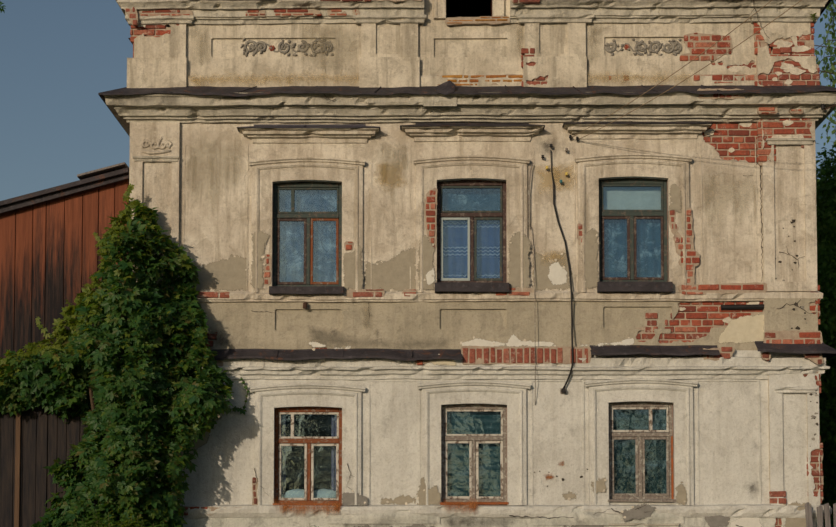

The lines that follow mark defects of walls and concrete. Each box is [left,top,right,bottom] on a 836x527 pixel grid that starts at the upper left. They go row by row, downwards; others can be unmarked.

flaking render [124,7,193,43]
flaking render [246,0,422,18]
flaking render [679,22,820,100]
flaking render [702,107,816,166]
peeling [342,188,438,298]
peeling [496,231,572,296]
flaking render [635,184,767,343]
flaking render [460,336,591,365]
flaking render [703,340,742,361]
flaking render [760,285,824,527]